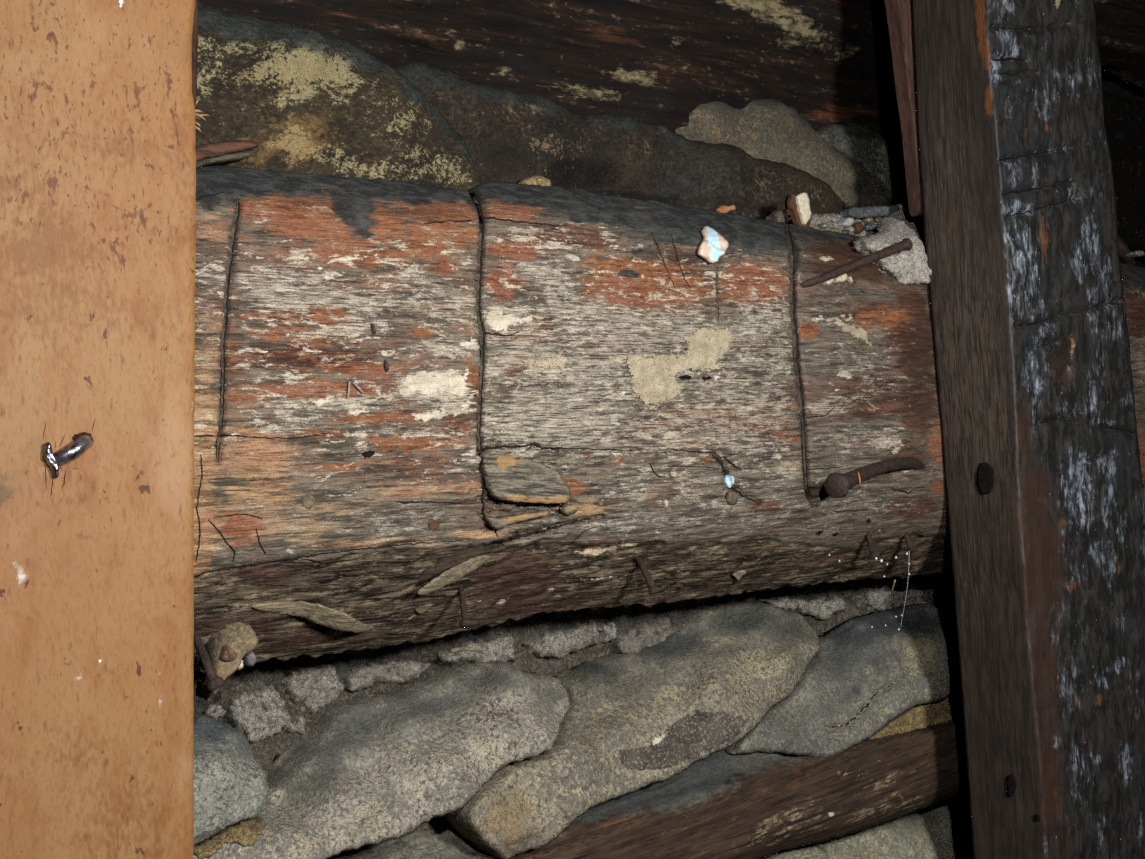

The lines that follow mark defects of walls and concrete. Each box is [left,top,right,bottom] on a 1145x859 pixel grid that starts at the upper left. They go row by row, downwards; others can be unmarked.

peeling [785,193,812,229]
peeling [697,226,729,264]
peeling [317,254,371,282]
peeling [484,309,533,332]
peeling [612,325,735,407]
peeling [307,395,335,407]
peeling [397,369,472,423]
peeling [575,541,637,557]